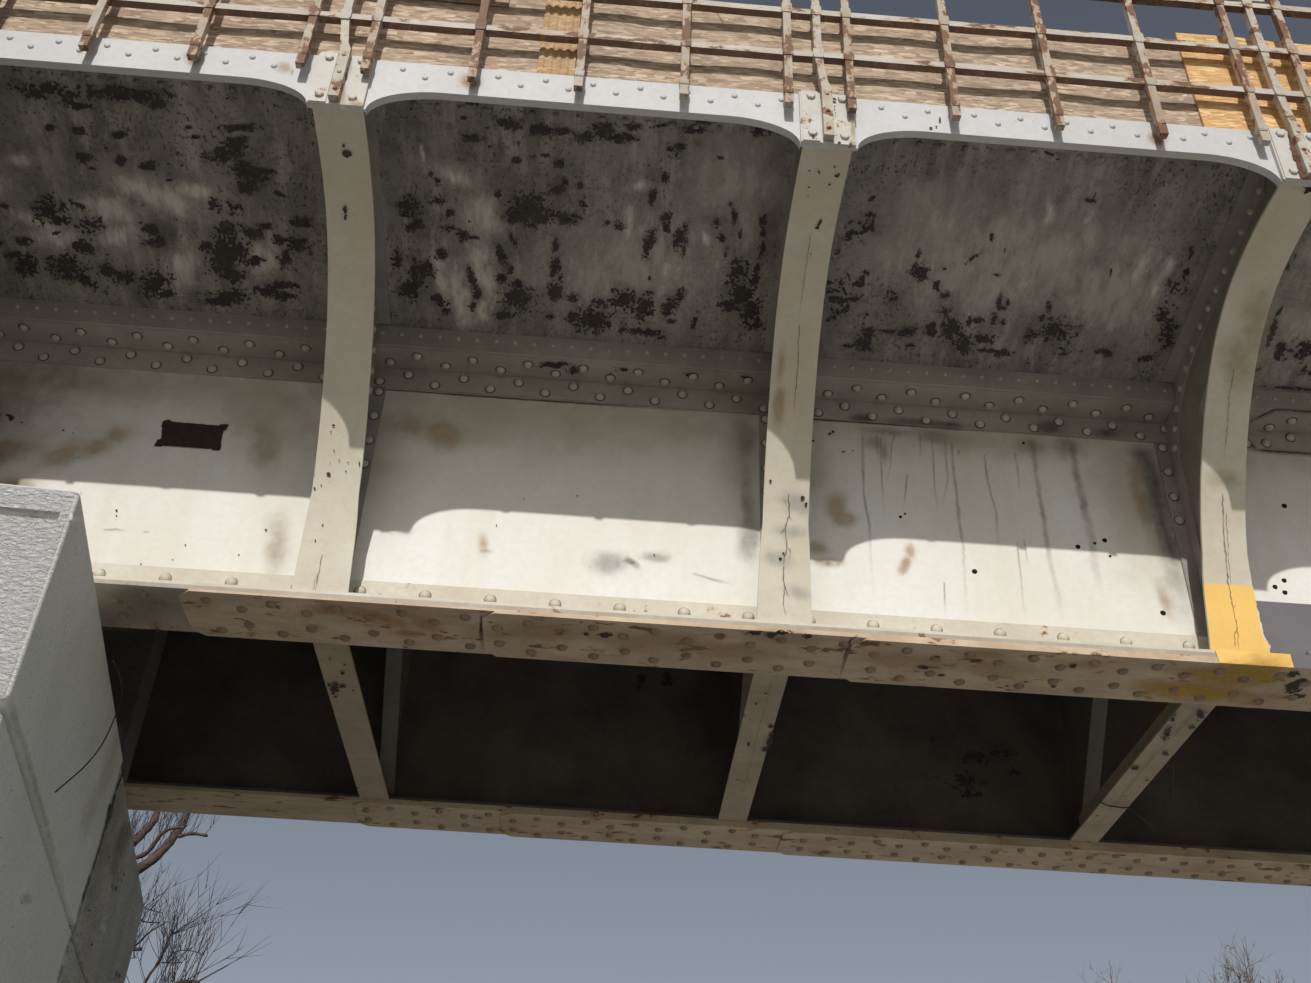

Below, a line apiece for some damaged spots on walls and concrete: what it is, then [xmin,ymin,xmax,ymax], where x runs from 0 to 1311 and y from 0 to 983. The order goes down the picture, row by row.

water stain [0,154,213,251]
water stain [160,245,200,296]
water stain [247,243,280,275]
water stain [419,145,504,329]
water stain [562,179,720,318]
water stain [871,187,1176,336]
water stain [1254,244,1311,384]
rust [1288,130,1309,178]
peeling [154,419,229,451]
crack [781,495,791,613]
crack [1222,493,1239,646]
peeling [1284,671,1311,698]